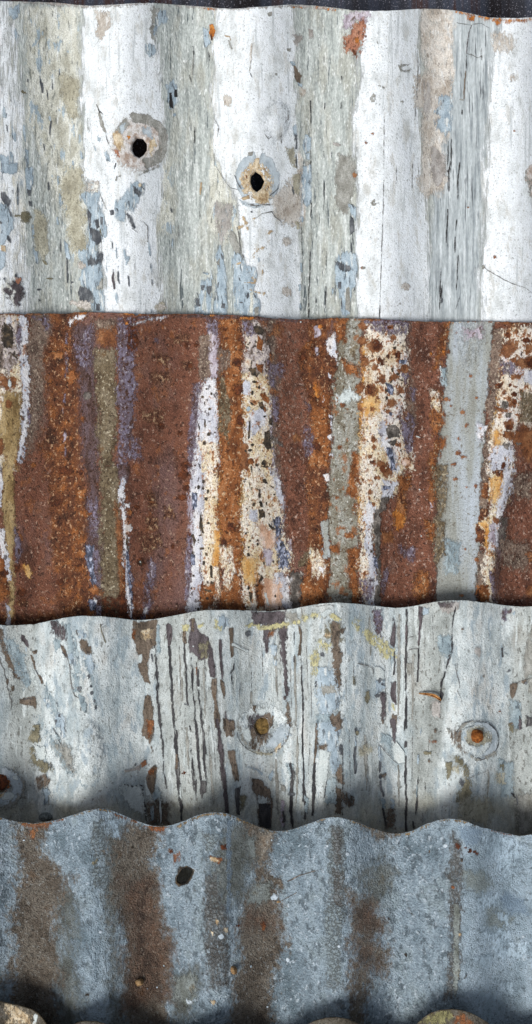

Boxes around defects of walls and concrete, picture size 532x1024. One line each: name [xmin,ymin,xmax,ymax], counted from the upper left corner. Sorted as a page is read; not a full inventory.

peeling [165,79,178,116]
peeling [287,48,302,87]
rust [232,5,371,58]
rust [455,11,532,25]
peeling [31,127,159,313]
peeling [332,142,366,317]
rust [49,312,297,620]
peeling [117,201,460,831]
rust [297,318,532,692]
rust [14,564,33,607]
peeling [507,624,532,733]
peeling [487,759,532,835]